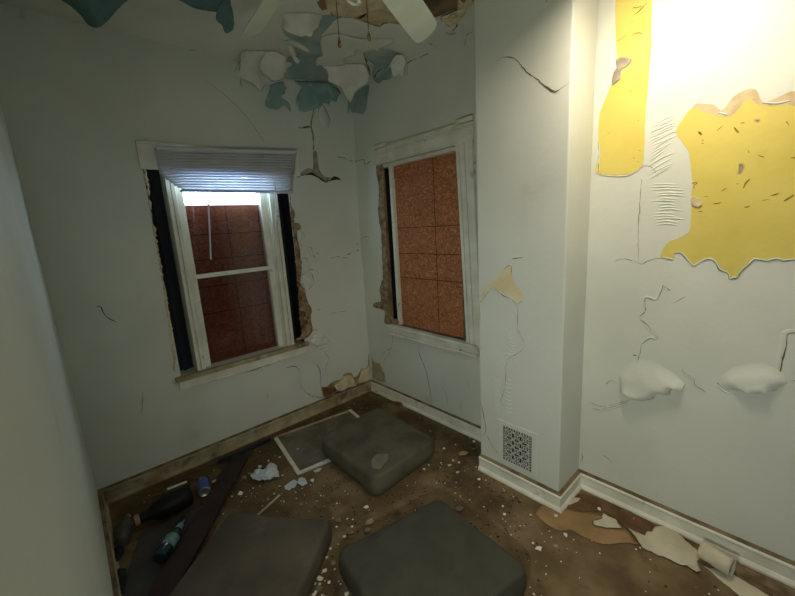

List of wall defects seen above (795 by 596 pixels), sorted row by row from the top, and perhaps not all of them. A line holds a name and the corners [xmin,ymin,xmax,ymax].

peeling [62,0,128,28]
peeling [180,0,234,33]
spalling [423,0,474,35]
peeling [260,0,406,114]
crack [500,57,570,93]
peeling [595,0,652,177]
crack [297,110,370,183]
peeling [661,89,795,280]
spalling [290,195,329,349]
spalling [373,165,399,325]
crack [634,285,684,362]
crack [776,328,795,381]